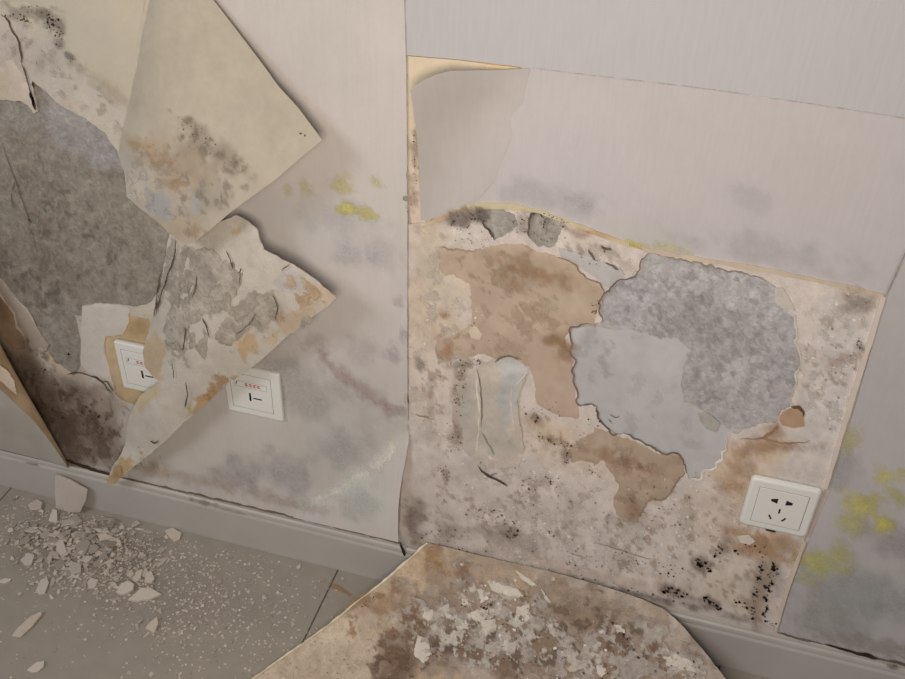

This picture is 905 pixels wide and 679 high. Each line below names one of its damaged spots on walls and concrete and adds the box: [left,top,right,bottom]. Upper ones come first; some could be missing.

leakage [5,6,63,46]
spalling [0,60,169,394]
spalling [482,209,517,239]
spalling [527,212,805,481]
leakage [9,355,120,475]
leakage [652,562,694,608]
leakage [695,529,905,668]